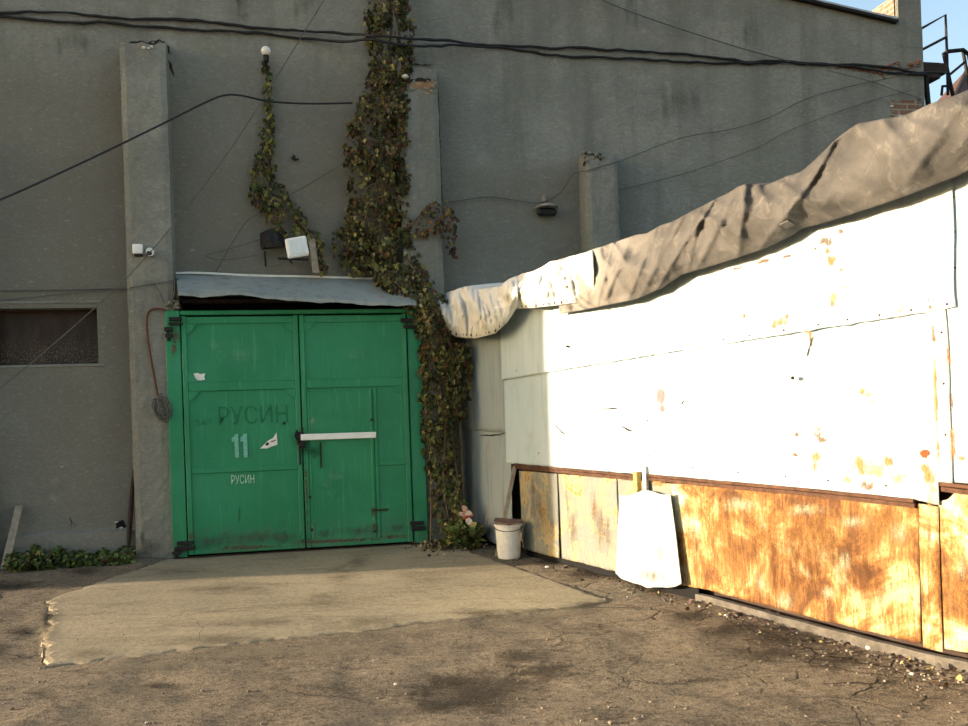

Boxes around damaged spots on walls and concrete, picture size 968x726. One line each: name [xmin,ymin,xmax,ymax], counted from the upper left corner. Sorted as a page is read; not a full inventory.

rust [814,229,843,272]
rust [812,425,827,469]
rust [842,456,906,490]
rust [919,428,968,492]